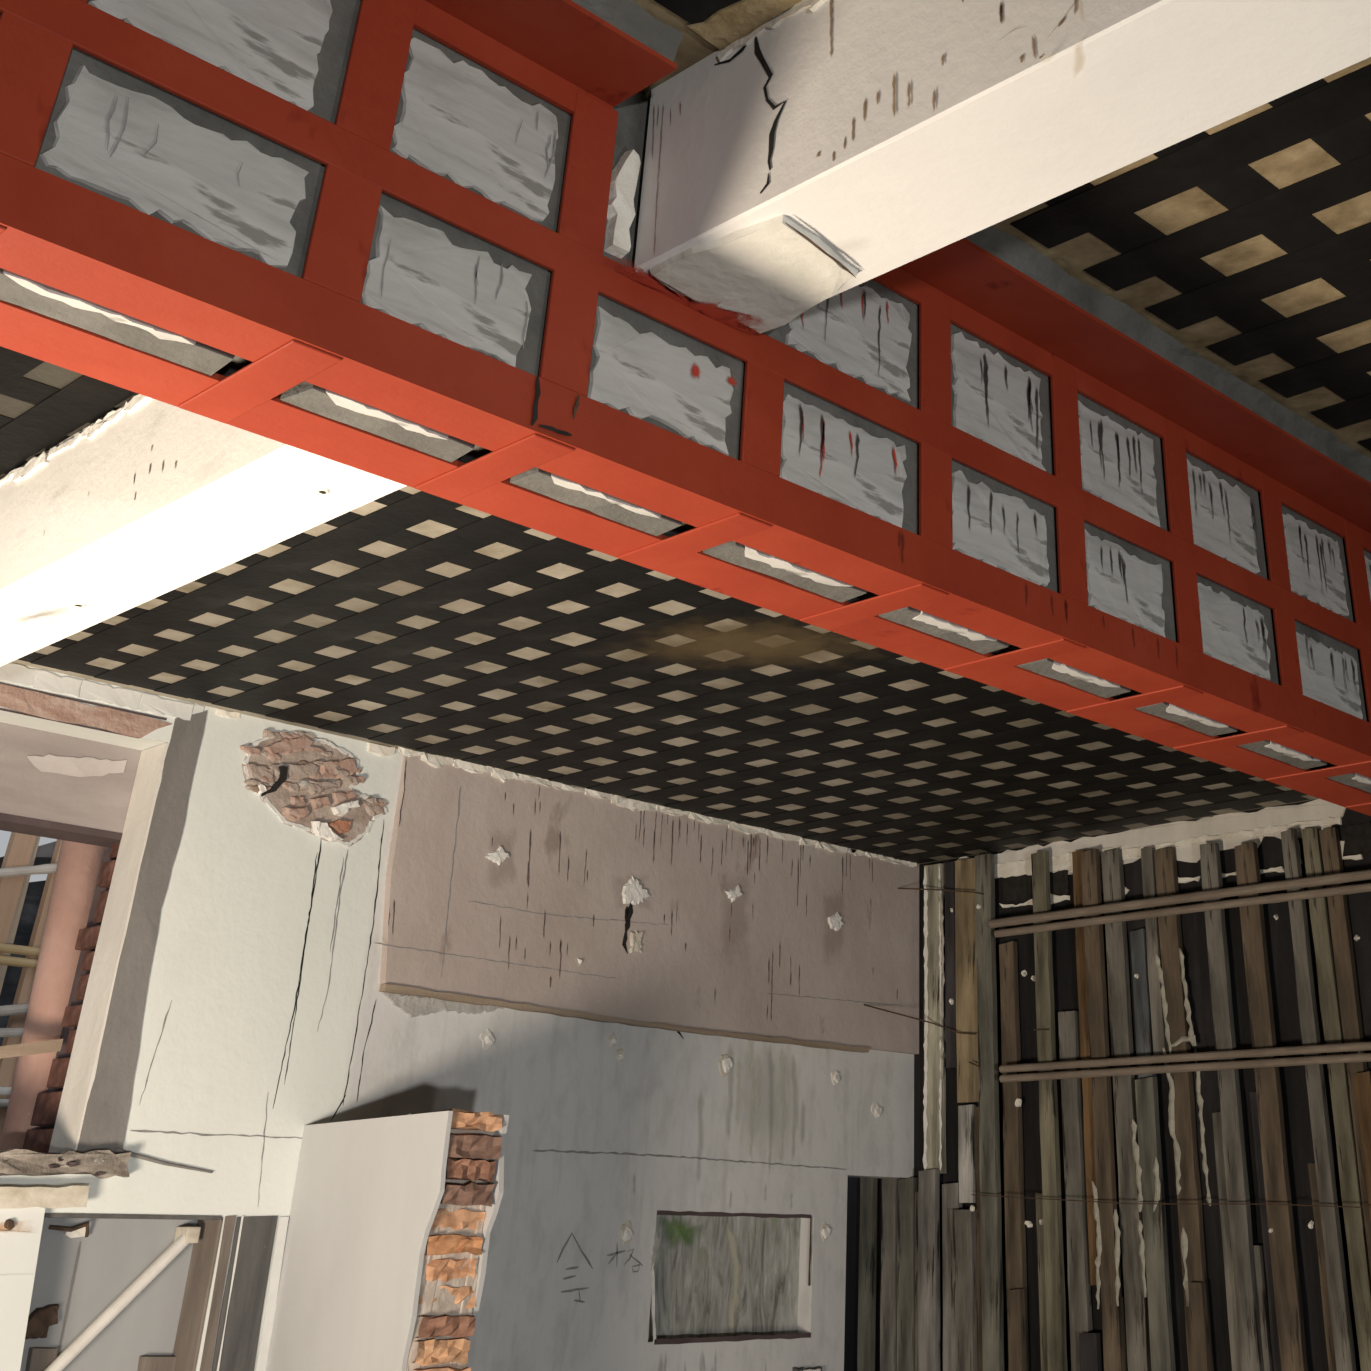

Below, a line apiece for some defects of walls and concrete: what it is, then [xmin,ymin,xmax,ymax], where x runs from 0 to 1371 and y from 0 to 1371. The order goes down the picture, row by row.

peeling [686,0,827,62]
crack [715,36,786,194]
rust [817,74,910,161]
crack [786,223,856,278]
spalling [240,729,917,867]
crack [131,761,668,1205]
damp [1131,949,1211,1306]
damp [1092,1181,1121,1309]